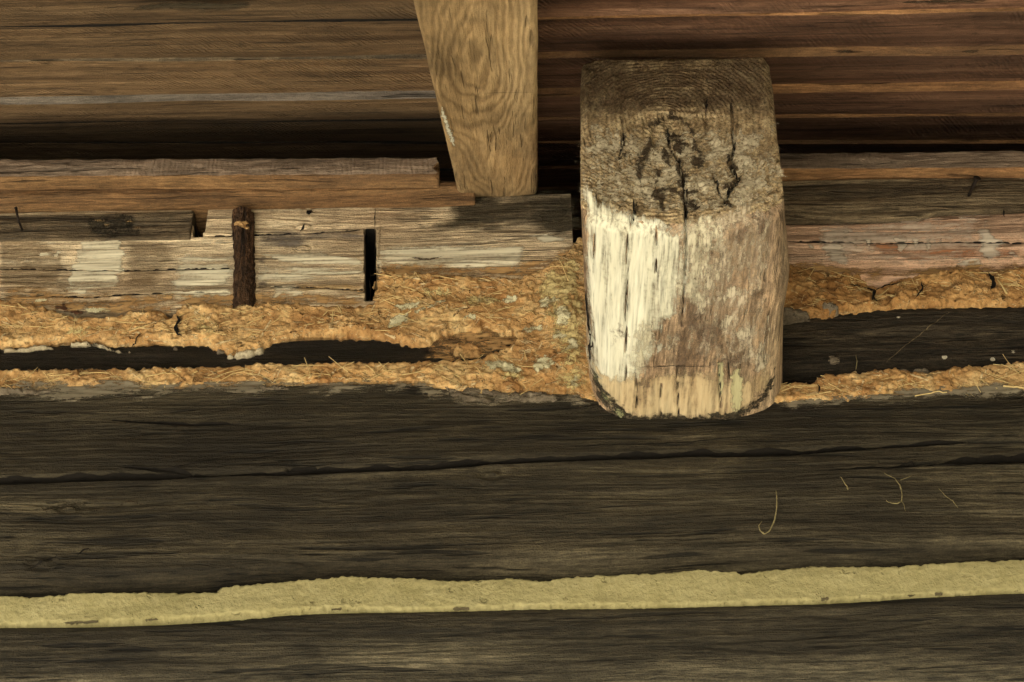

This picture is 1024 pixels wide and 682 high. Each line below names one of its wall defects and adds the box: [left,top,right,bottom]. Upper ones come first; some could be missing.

crack [703,68,740,204]
crack [663,94,688,328]
crack [0,437,1024,485]